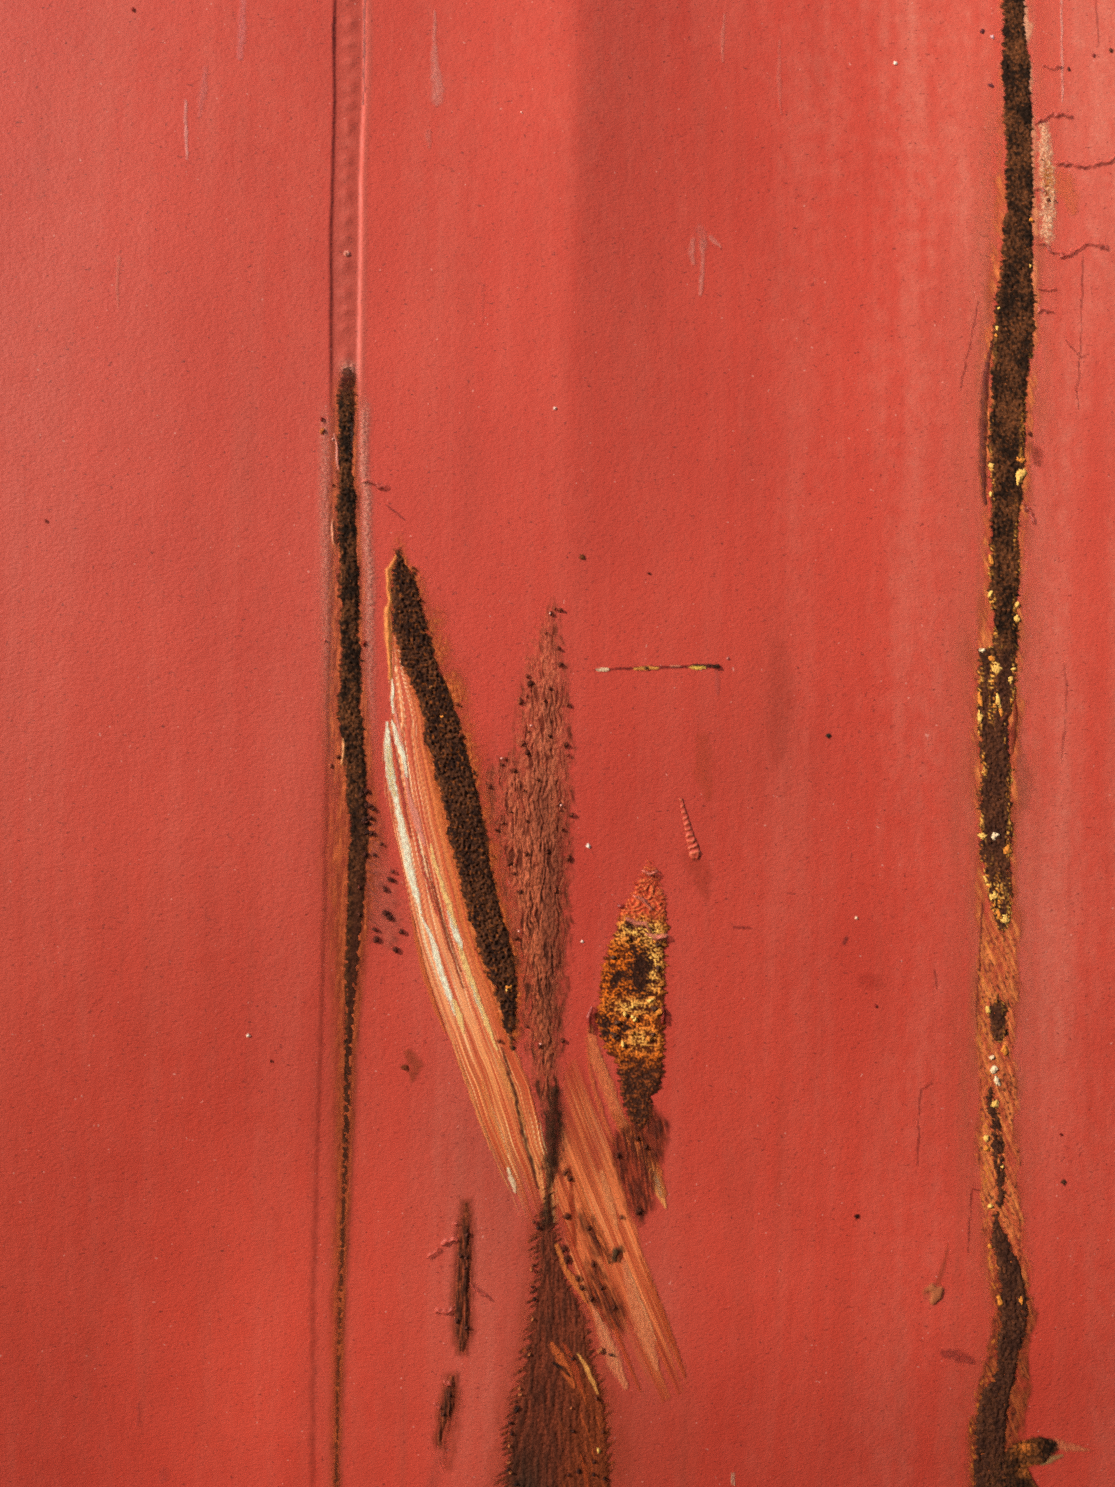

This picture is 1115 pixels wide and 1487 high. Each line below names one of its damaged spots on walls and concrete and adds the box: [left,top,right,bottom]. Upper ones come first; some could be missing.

corrosion [319,363,405,1487]
corrosion [433,1376,455,1446]
spalling [384,547,521,1050]
corrosion [428,1202,489,1352]
corrosion [485,604,623,1487]
corrosion [586,861,670,1222]
corrosion [969,0,1085,1487]